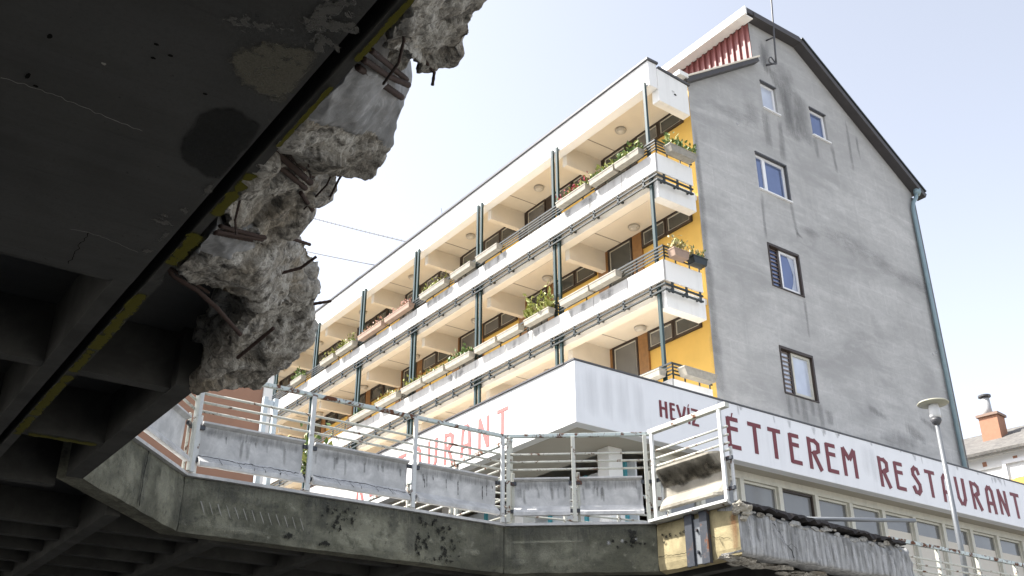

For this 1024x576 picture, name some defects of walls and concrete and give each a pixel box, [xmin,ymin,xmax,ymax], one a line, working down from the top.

spalling [165,0,487,396]
peeling [13,294,147,446]
water stain [319,502,358,548]
water stain [415,516,460,564]
spalling [718,554,828,576]
spalling [732,499,902,552]